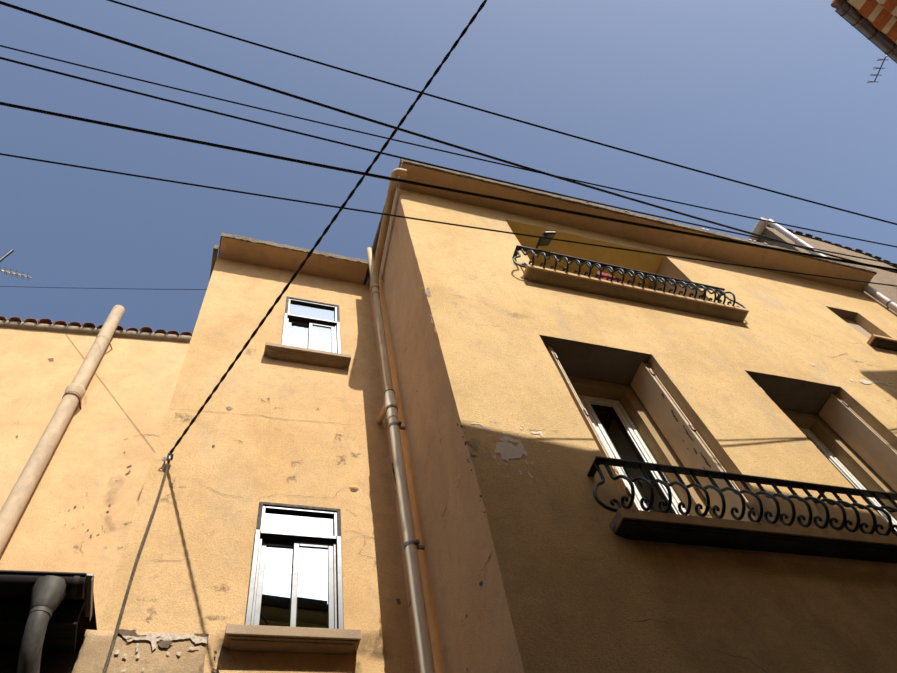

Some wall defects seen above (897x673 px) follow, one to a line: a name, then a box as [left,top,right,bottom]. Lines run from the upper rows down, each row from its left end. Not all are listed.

peeling [457,420,543,478]
spalling [118,629,173,648]